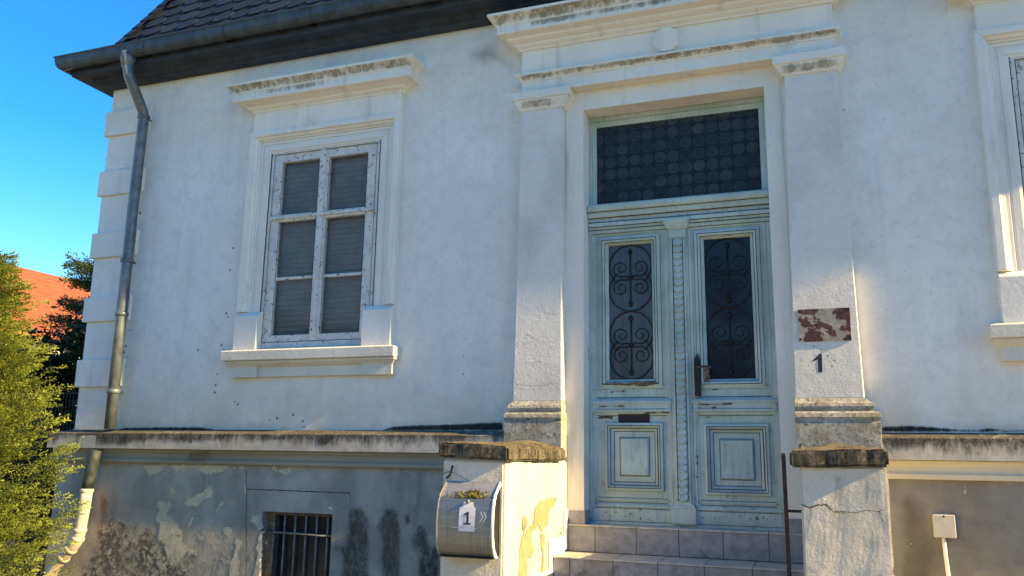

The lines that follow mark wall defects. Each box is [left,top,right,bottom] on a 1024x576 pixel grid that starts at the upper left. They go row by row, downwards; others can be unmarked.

damp [100,427,216,444]
damp [883,426,956,447]
spalling [83,463,267,576]
damp [342,509,367,576]
damp [381,511,409,576]
damp [415,530,438,576]
peeling [518,497,557,576]
crack [801,504,885,525]